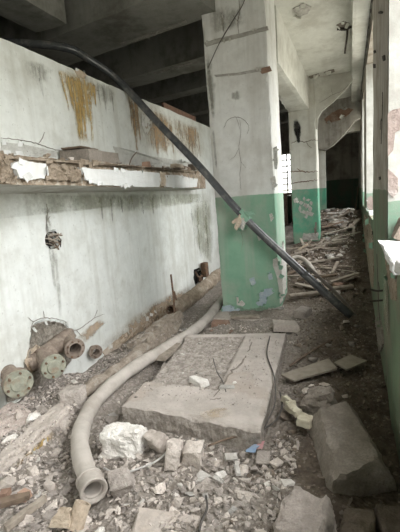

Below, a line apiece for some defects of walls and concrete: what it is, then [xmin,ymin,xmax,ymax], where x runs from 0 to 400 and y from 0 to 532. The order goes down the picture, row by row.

peeling [293,3,311,19]
rust [59,73,96,138]
rust [129,100,141,150]
peeling [388,108,400,156]
peeling [0,138,198,189]
peeling [293,197,314,219]
peeling [388,169,398,198]
peeling [256,257,287,308]